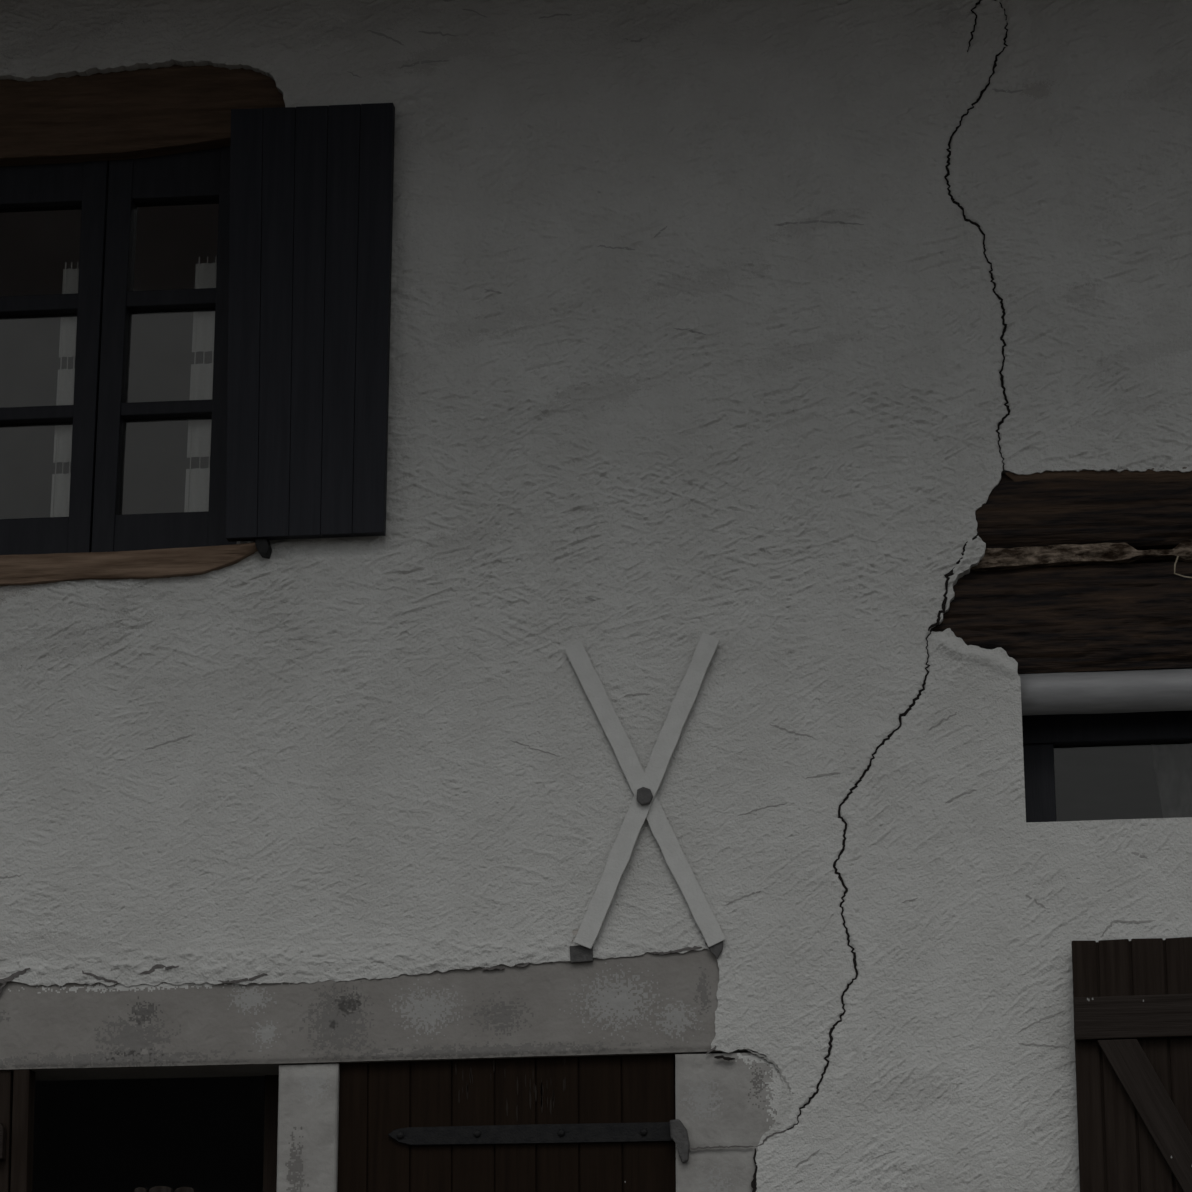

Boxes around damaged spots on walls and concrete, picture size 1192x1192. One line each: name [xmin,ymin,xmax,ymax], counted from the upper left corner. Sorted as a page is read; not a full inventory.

crack [944,0,1010,473]
crack [689,533,979,1192]
crack [0,968,30,995]
crack [82,964,179,983]
crack [218,973,268,984]